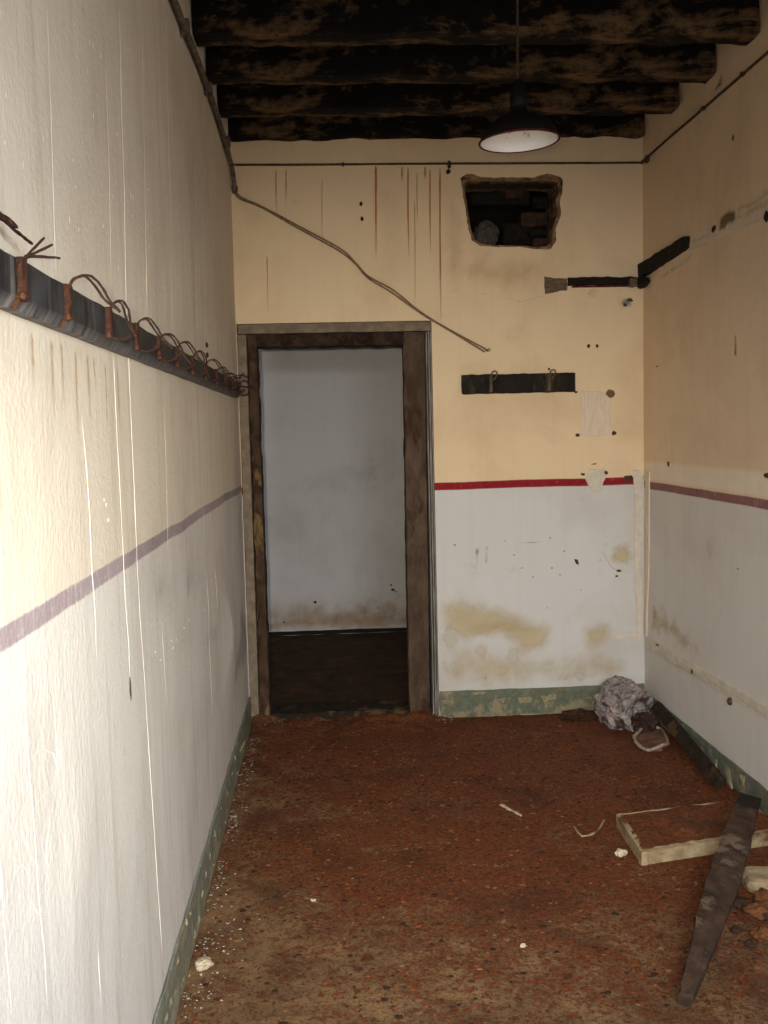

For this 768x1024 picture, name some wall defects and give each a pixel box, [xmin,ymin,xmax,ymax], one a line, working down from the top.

spalling [460,174,563,250]